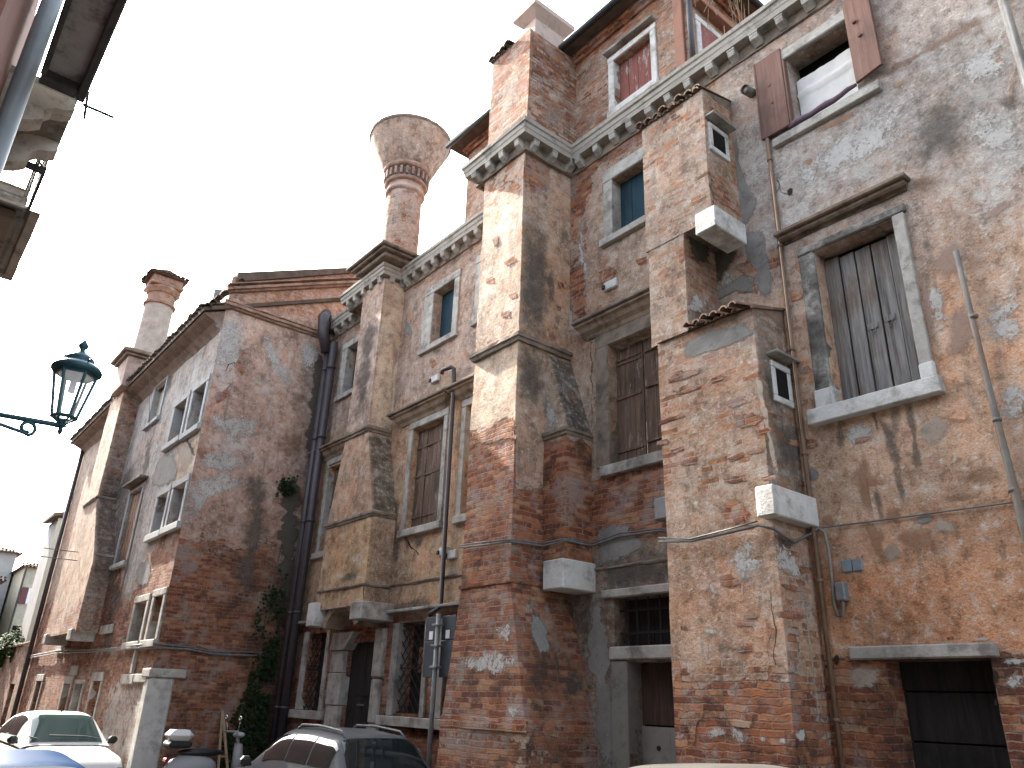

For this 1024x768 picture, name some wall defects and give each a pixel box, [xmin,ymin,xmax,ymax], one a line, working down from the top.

peeling [687,124,780,312]
leakage [521,361,541,400]
flaking render [178,385,263,524]
leakage [873,415,904,497]
leakage [907,404,919,464]
flaking render [710,541,760,595]
flaking render [771,544,801,592]
crack [767,603,777,666]
flaking render [709,713,753,742]